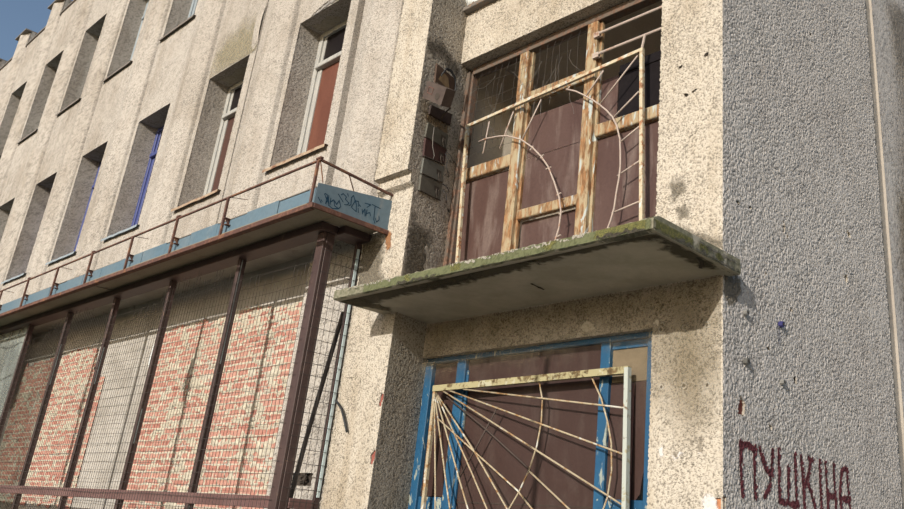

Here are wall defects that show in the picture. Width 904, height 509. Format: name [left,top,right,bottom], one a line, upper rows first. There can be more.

water stain [405,224,430,274]
water stain [339,235,715,311]
water stain [723,275,742,305]